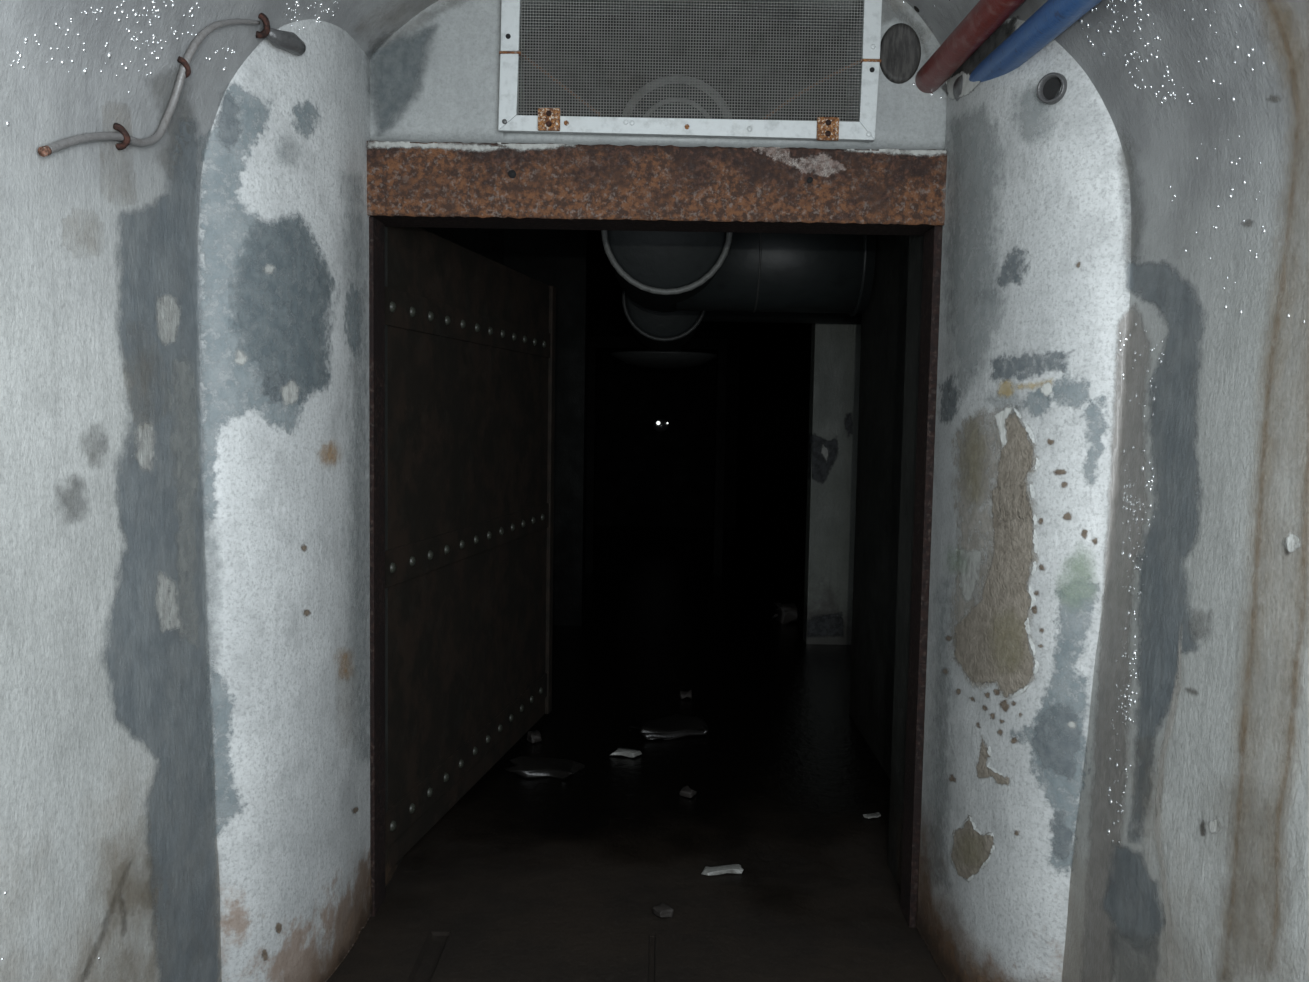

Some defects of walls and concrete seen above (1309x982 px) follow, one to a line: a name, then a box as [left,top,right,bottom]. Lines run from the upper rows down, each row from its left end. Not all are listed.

leakage [105,71,370,982]
peeling [943,405,1068,785]
leakage [939,112,1203,982]
corrosion [915,833,1002,982]
peeling [950,816,995,882]